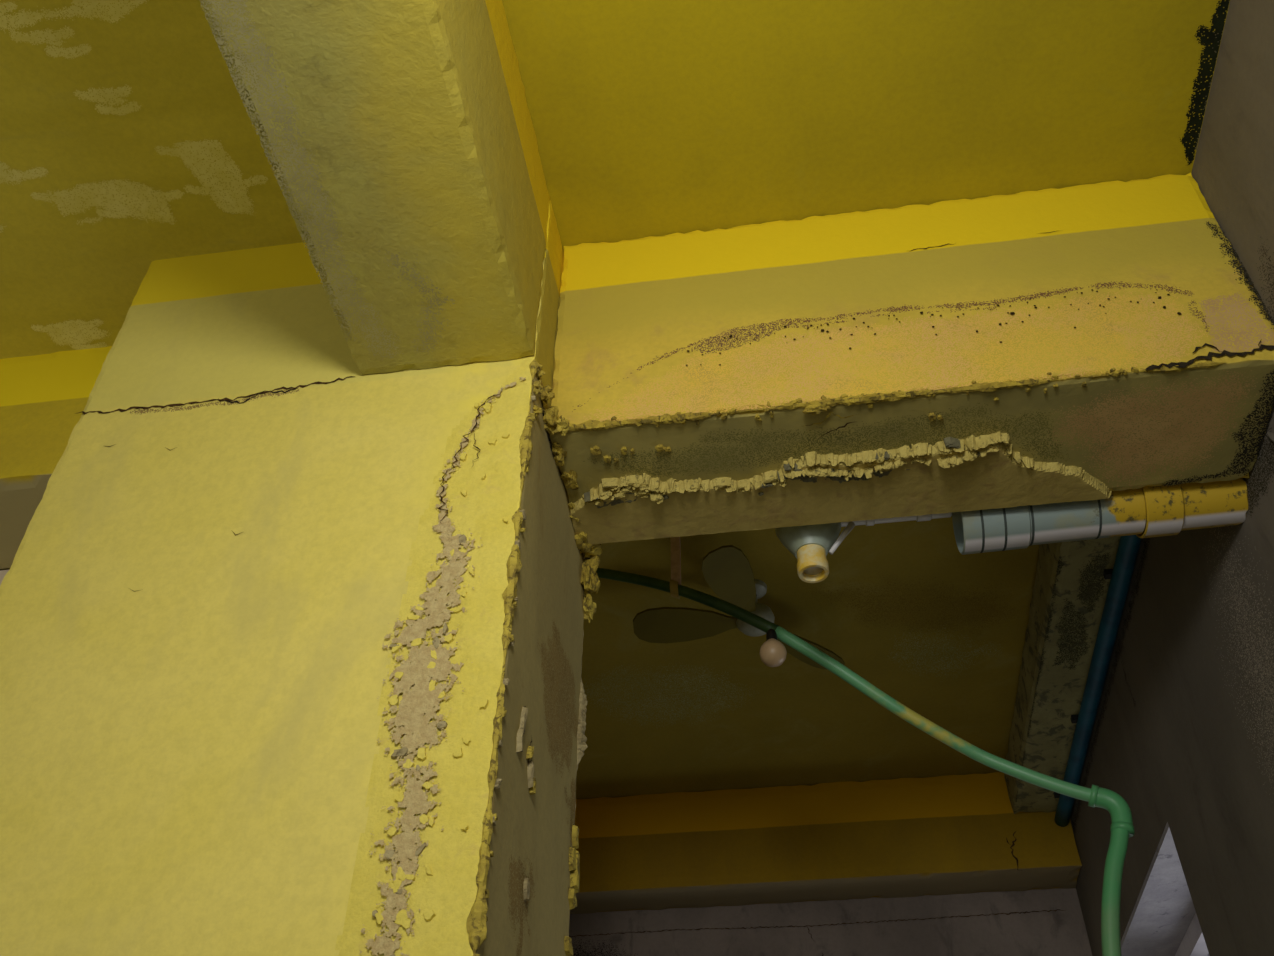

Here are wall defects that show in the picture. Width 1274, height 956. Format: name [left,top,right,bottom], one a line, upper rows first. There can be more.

peeling [0,0,149,60]
peeling [73,84,141,115]
leakage [1180,0,1230,166]
peeling [0,139,269,225]
peeling [31,318,109,350]
crack [79,376,355,415]
crack [1144,340,1274,370]
flaking render [360,359,1224,956]
leakage [538,622,578,847]
leakage [508,854,535,956]